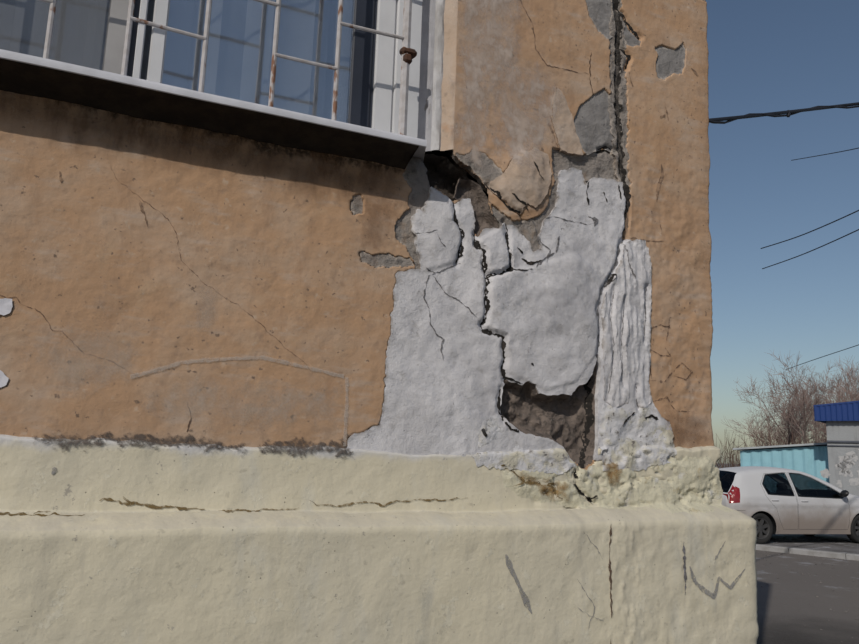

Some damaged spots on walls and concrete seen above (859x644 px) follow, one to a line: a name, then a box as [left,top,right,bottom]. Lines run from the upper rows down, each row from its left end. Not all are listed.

spalling [655,43,698,80]
spalling [359,0,641,269]
crack [656,164,664,200]
crack [1,295,134,374]
crack [417,185,598,421]
crack [500,0,662,502]
spalling [471,364,677,475]
crack [0,496,464,516]
crack [577,526,613,644]
crack [680,543,688,594]